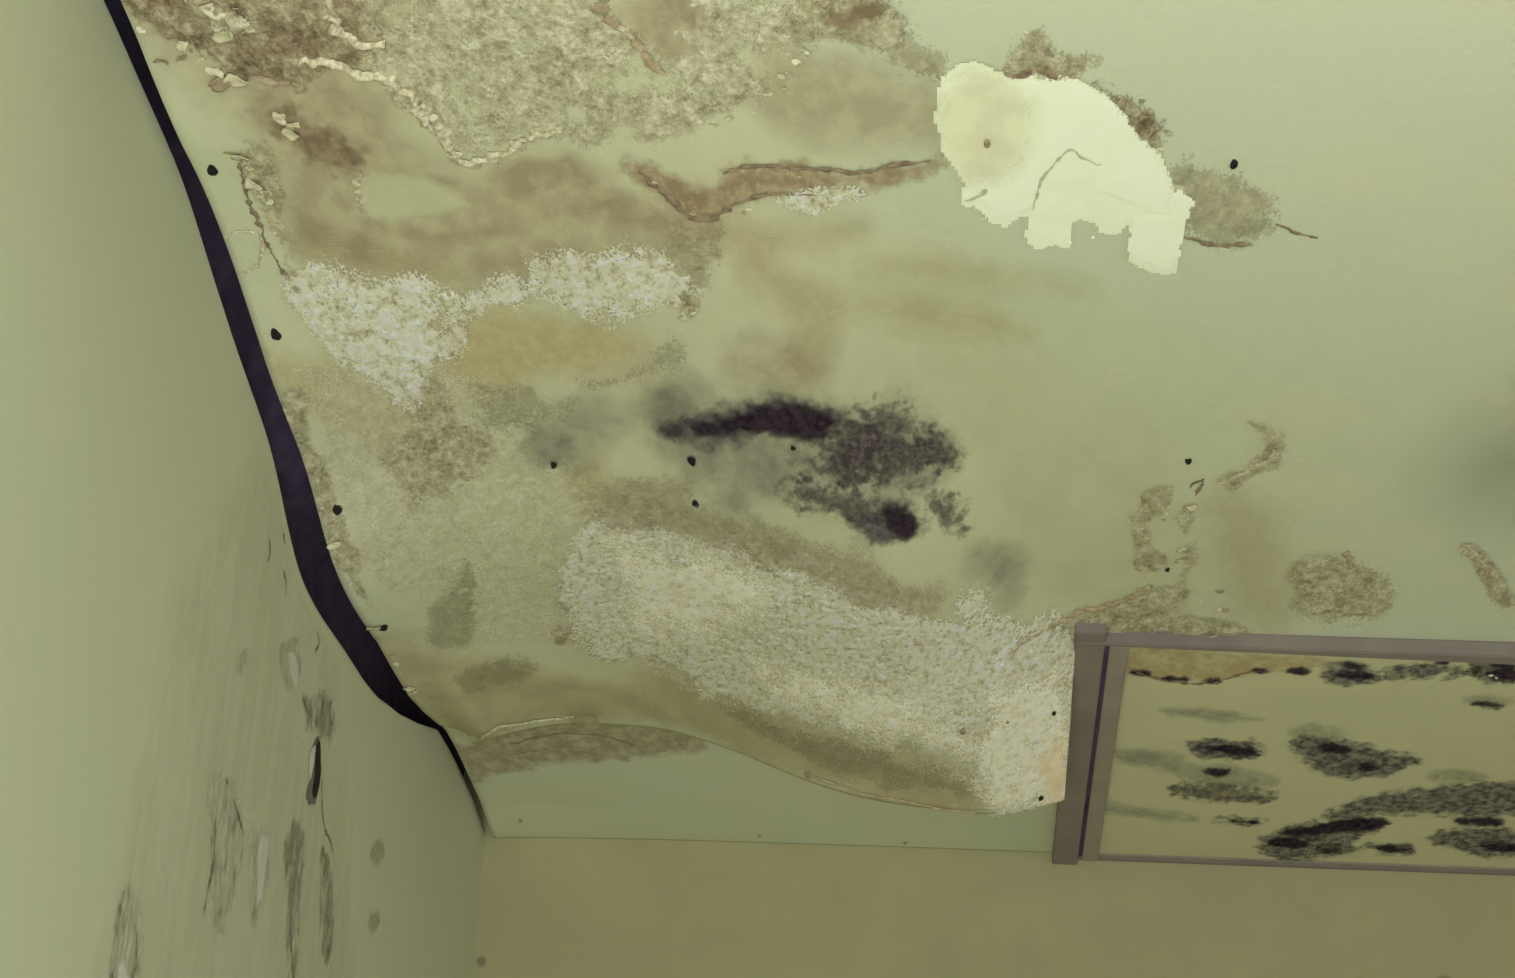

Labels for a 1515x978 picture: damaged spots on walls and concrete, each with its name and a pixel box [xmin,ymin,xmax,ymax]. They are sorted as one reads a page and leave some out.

spalling [121,0,908,169]
spalling [223,112,300,293]
flaking render [934,25,1253,275]
spalling [677,289,701,322]
damp [266,98,1075,819]
spalling [1284,550,1398,627]
damp [1129,667,1267,685]
damp [1287,661,1515,710]
damp [1117,736,1515,861]